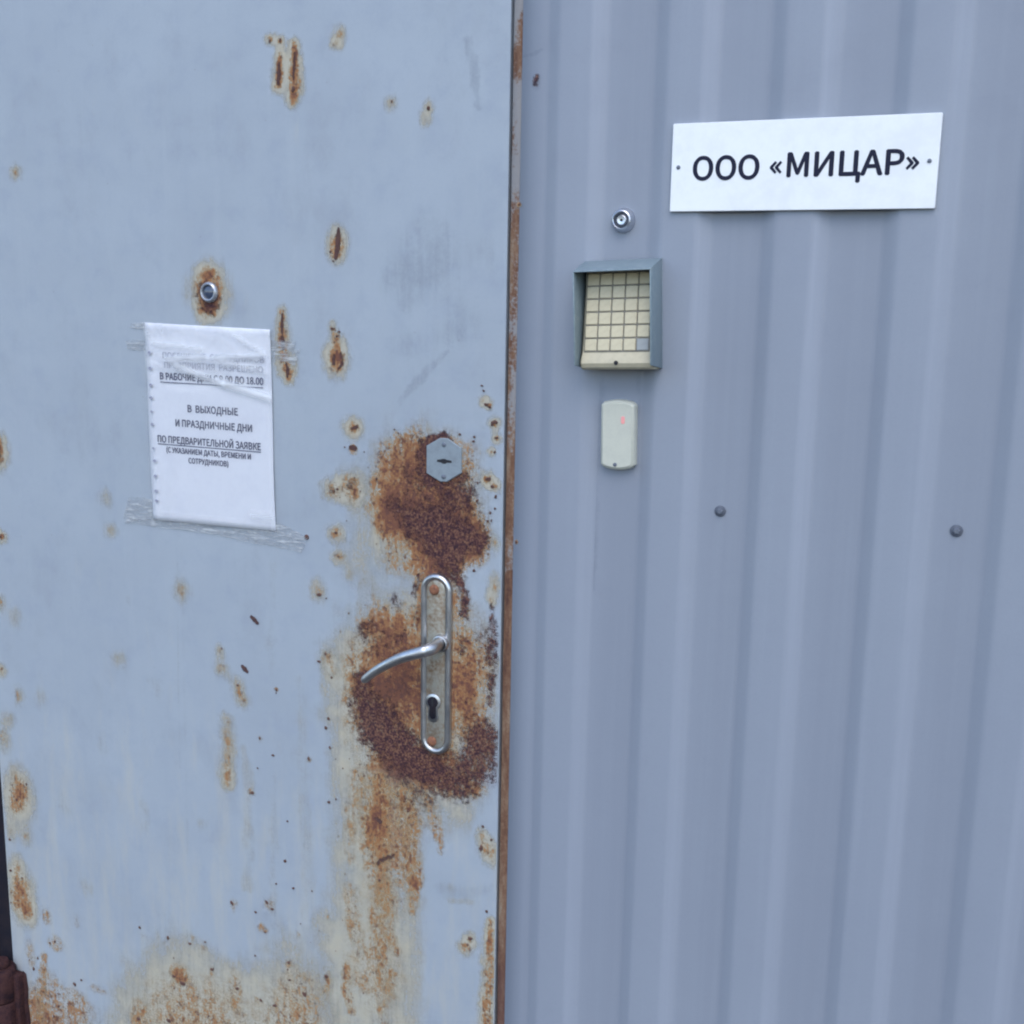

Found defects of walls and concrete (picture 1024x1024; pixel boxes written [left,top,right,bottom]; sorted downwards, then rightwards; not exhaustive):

corrosion [265,34,304,109]
corrosion [191,259,230,326]
corrosion [275,306,297,384]
corrosion [323,321,348,377]
corrosion [479,385,501,456]
corrosion [115,425,501,1024]
corrosion [4,767,35,841]
corrosion [8,855,49,927]
corrosion [27,937,88,1024]